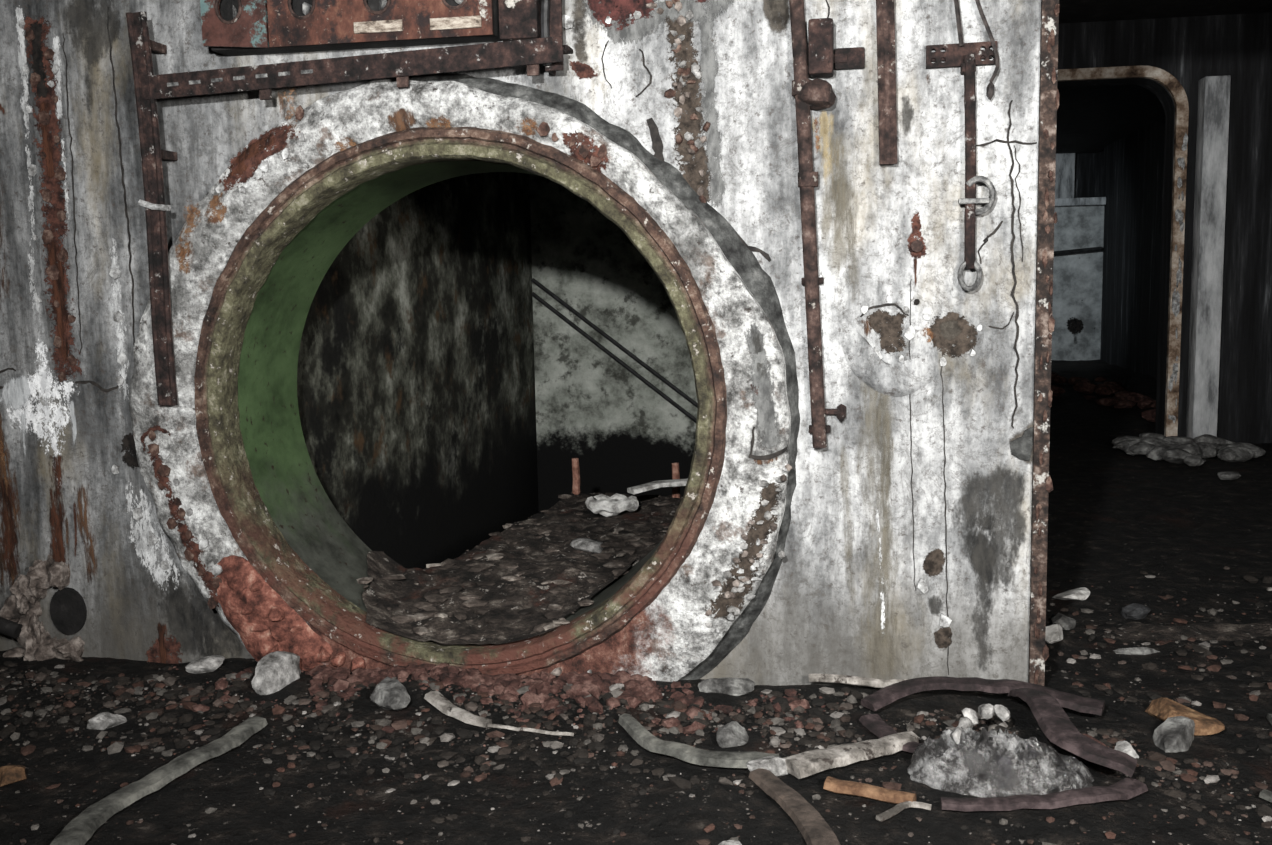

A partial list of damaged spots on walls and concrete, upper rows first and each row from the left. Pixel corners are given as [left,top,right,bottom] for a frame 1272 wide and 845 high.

crack [976,100,1037,428]
leakage [0,339,79,487]
rust [217,555,366,672]
leakage [956,466,1026,666]